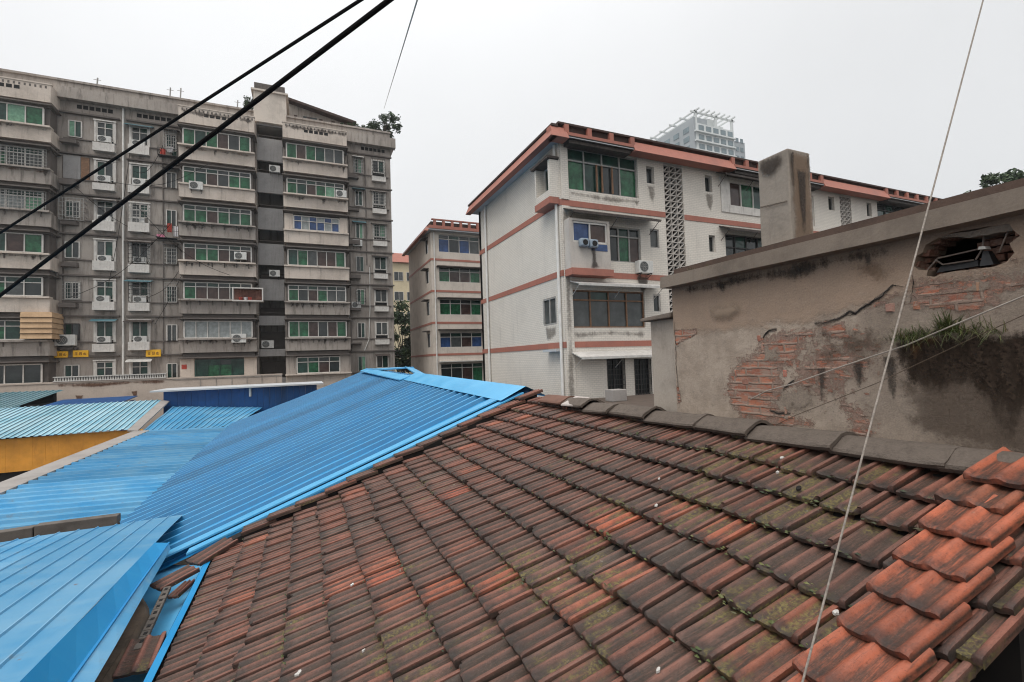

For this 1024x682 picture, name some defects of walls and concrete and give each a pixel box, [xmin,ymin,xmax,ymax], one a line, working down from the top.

water stain [760,153,812,237]
crack [815,276,916,325]
flaking render [864,230,1024,322]
flaking render [723,320,884,437]
water stain [818,330,1024,453]